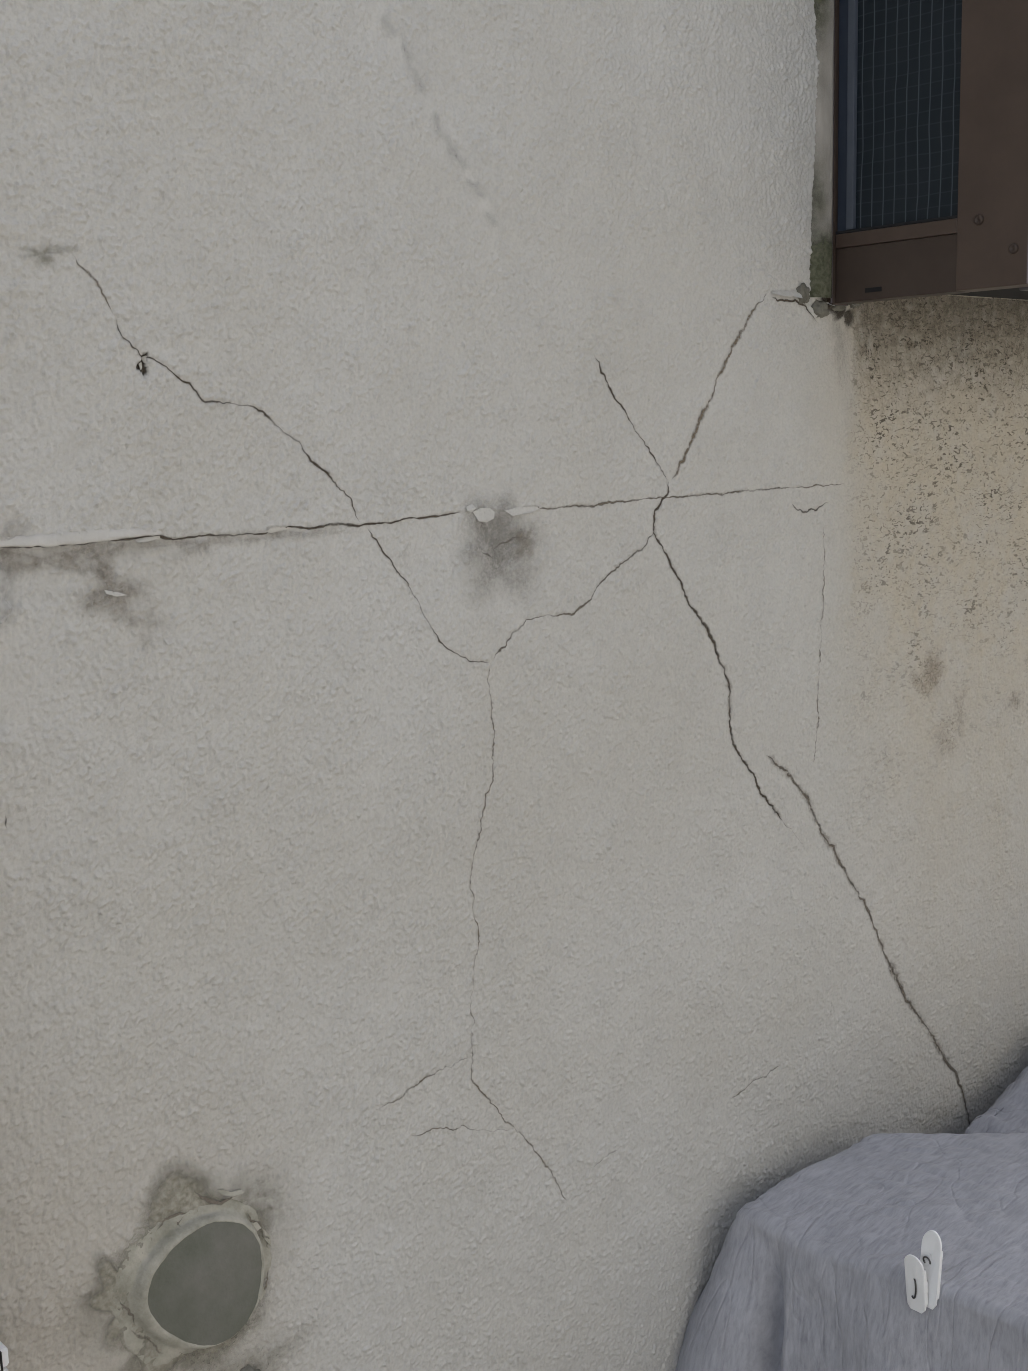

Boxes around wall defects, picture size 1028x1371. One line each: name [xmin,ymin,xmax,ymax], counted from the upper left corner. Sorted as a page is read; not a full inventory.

crack [76,260,271,420]
crack [0,296,970,1125]
crack [471,1069,564,1198]